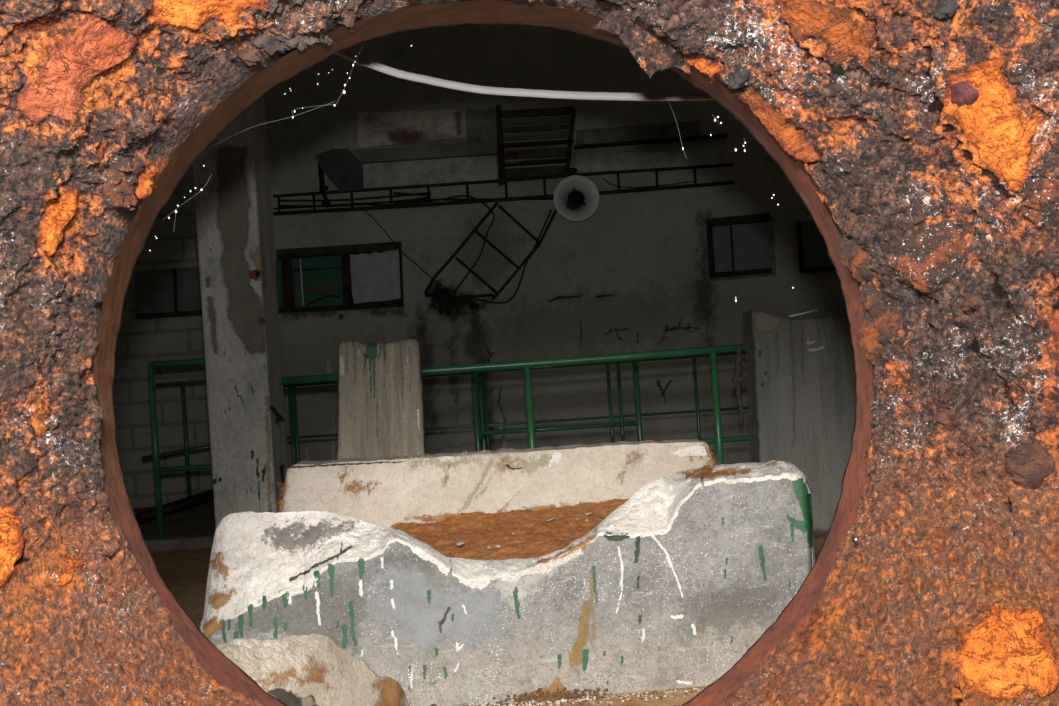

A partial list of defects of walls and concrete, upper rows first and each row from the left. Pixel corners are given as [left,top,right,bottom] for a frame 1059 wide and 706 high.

corrosion [145,0,270,31]
corrosion [16,13,136,126]
corrosion [734,87,822,165]
corrosion [939,56,1043,195]
corrosion [32,187,78,259]
corrosion [135,160,159,198]
peeling [216,146,266,353]
leakage [283,304,500,468]
corrosion [0,505,24,587]
crack [289,542,354,581]
spalling [200,445,814,633]
corrosion [954,603,1059,702]